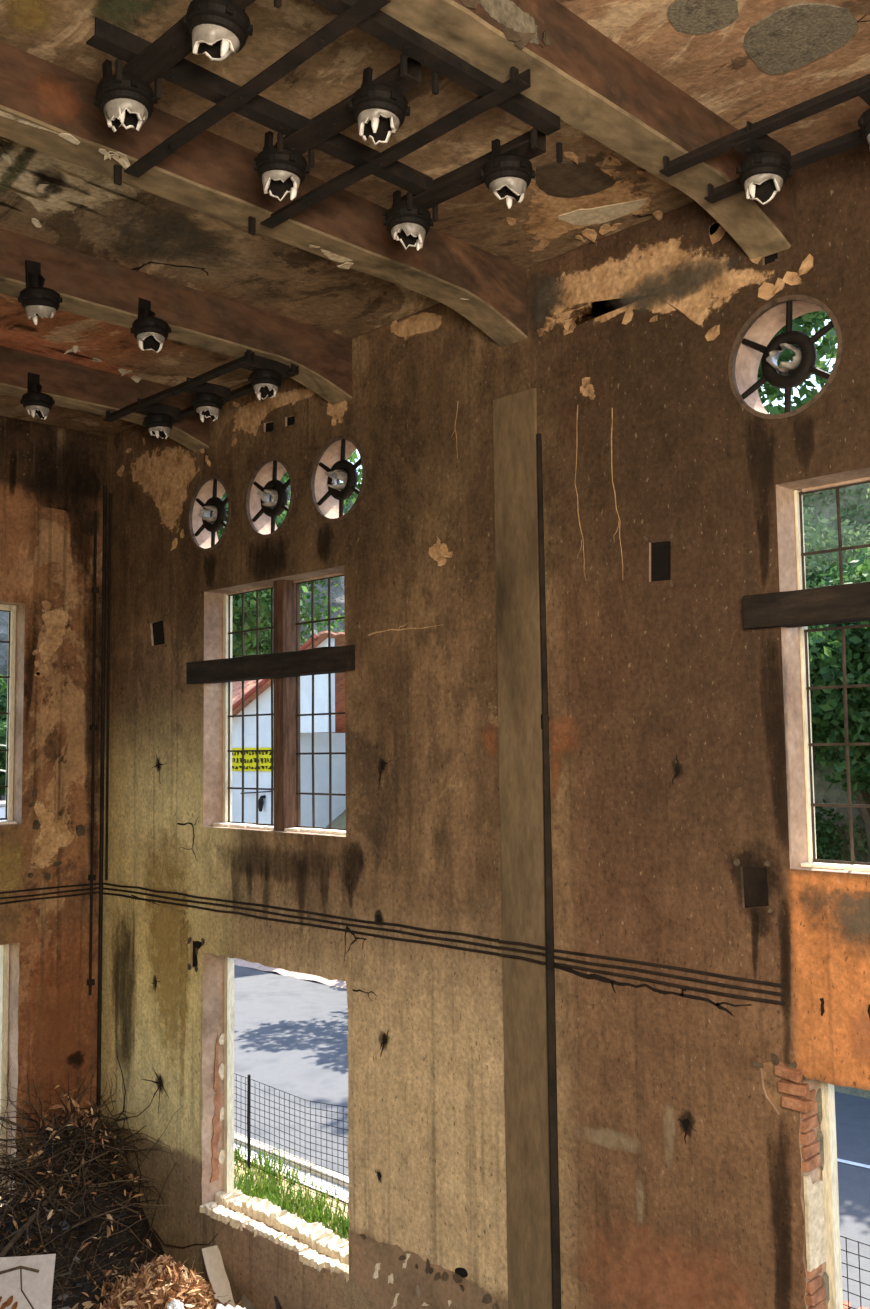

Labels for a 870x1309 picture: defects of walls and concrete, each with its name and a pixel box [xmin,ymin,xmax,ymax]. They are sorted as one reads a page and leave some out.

flaking render [460,0,551,49]
spalling [667,0,859,75]
flaking render [506,151,663,253]
flaking render [530,222,813,341]
flaking render [117,437,211,551]
leakage [763,645,788,837]
leakage [801,893,870,944]
leakage [779,910,790,1046]
flaking render [349,1231,499,1309]